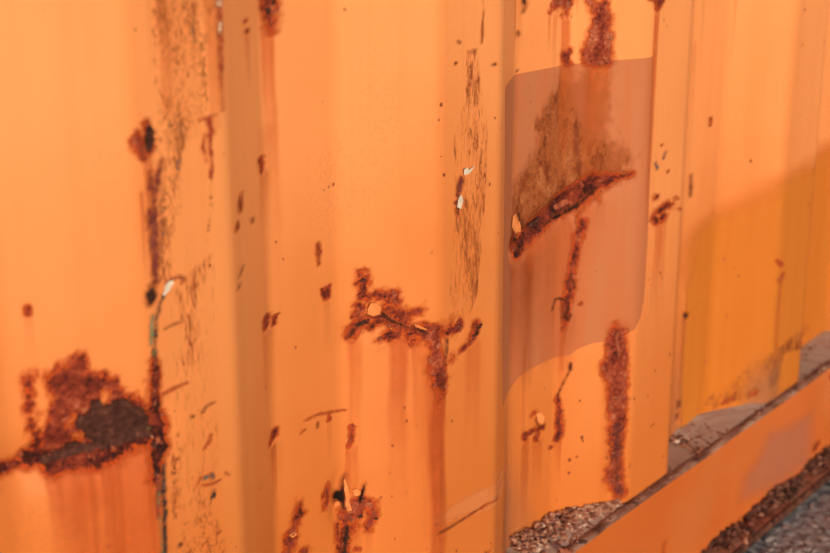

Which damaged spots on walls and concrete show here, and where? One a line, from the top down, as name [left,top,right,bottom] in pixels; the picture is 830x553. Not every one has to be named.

corrosion [260,0,280,35]
corrosion [548,0,574,24]
corrosion [561,0,614,86]
spalling [509,72,636,294]
corrosion [552,218,589,331]
corrosion [344,268,483,464]
corrosion [522,411,545,442]
corrosion [600,321,635,499]